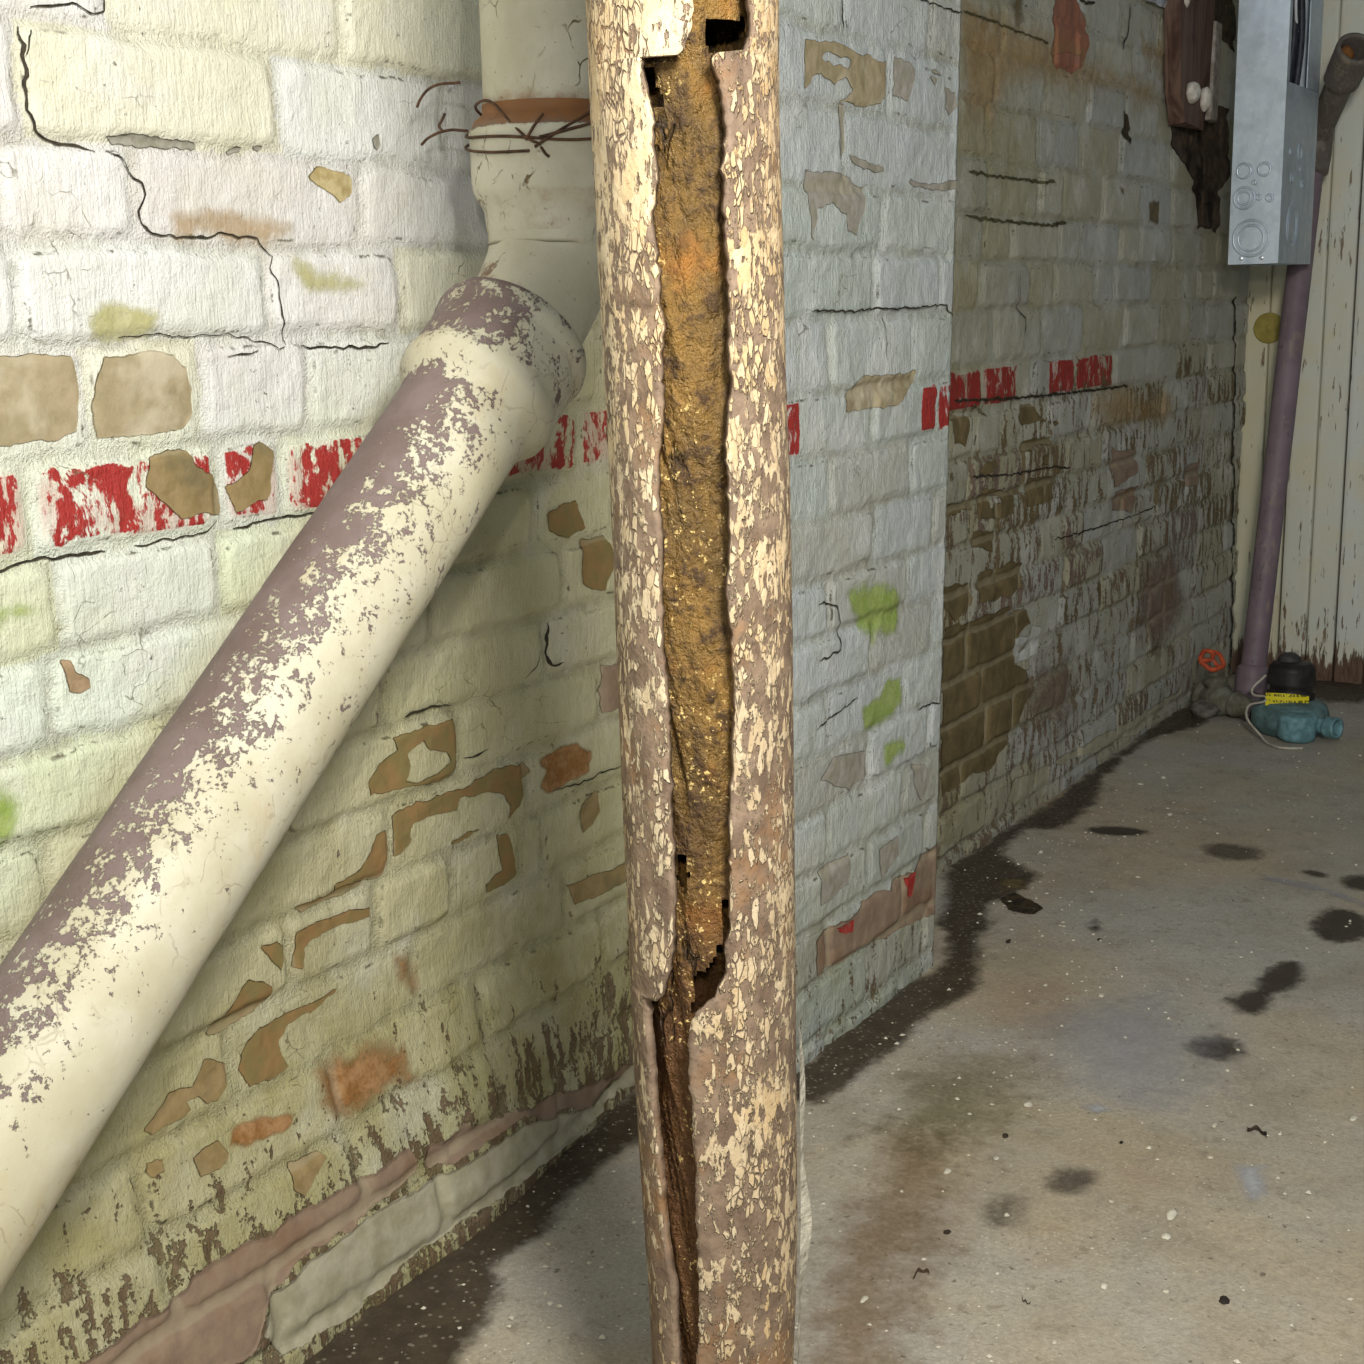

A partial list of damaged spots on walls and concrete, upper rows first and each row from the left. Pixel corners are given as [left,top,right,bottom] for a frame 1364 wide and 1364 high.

crack [924,0,1049,44]
crack [17,0,389,357]
crack [969,170,1056,184]
crack [965,214,1067,227]
peeling [0,350,192,446]
peeling [146,441,274,519]
peeling [911,561,1069,800]
peeling [261,719,530,970]
water stain [797,682,1206,1103]
water stain [1312,909,1364,943]
water stain [1226,962,1302,1012]
water stain [1190,1037,1243,1060]